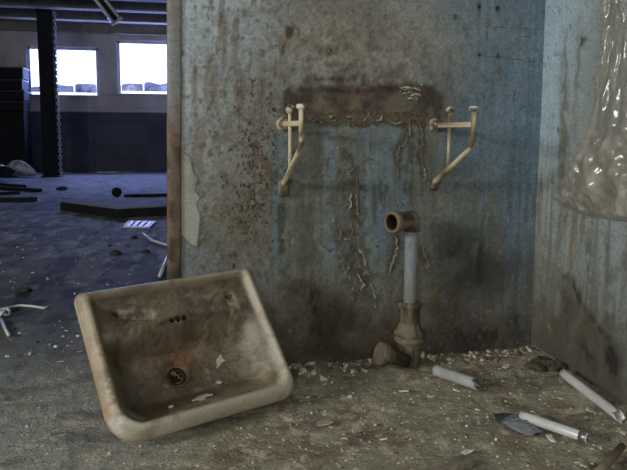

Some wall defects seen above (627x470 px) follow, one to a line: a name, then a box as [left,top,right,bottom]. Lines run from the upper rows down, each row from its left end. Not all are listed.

peeling [181,146,201,248]
rust [228,116,283,242]
peeling [324,145,386,308]
peeling [304,109,427,192]